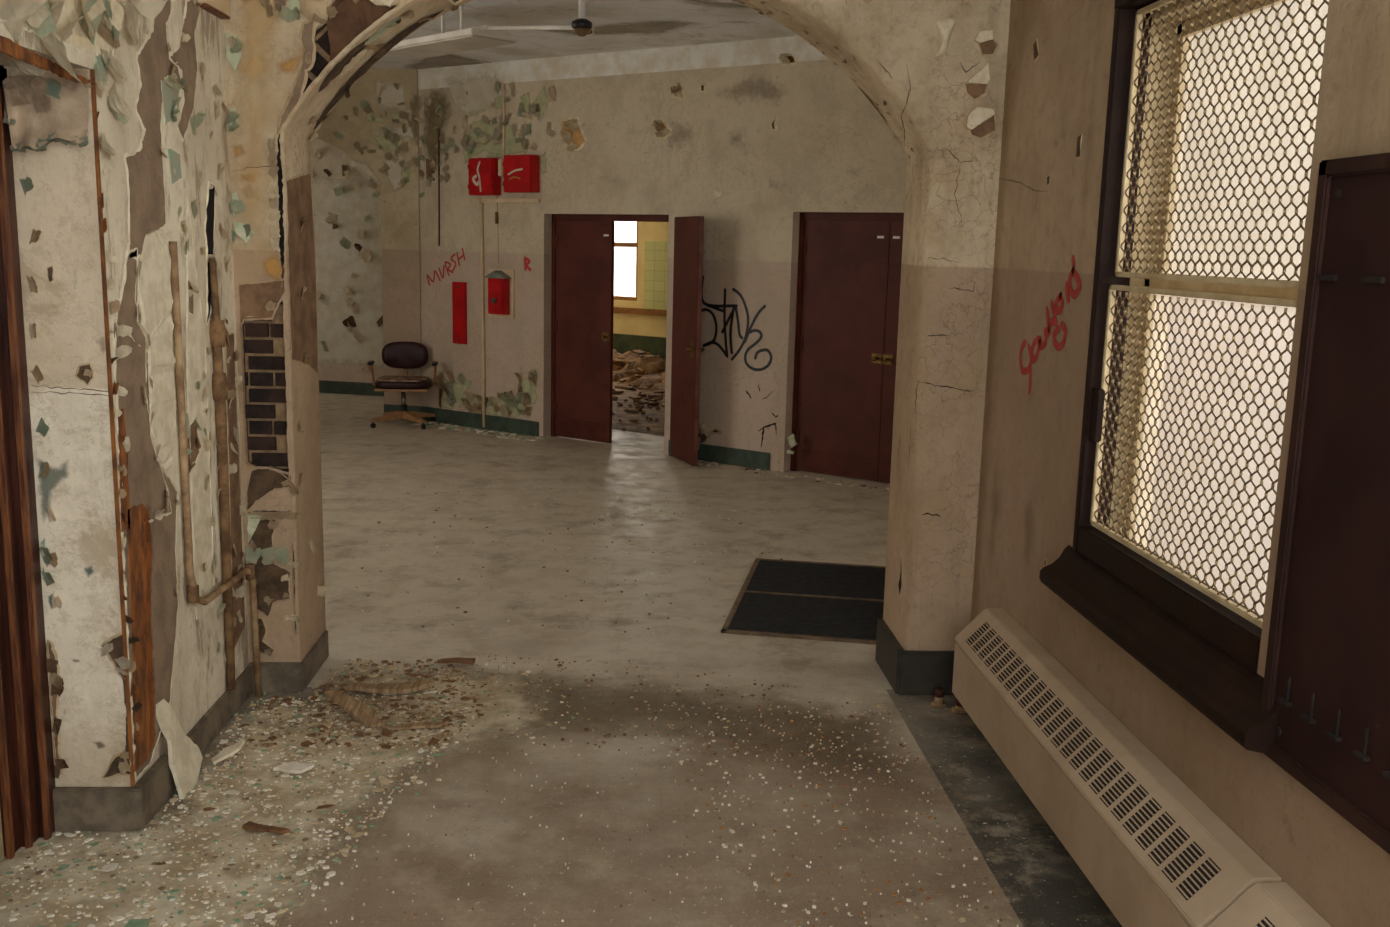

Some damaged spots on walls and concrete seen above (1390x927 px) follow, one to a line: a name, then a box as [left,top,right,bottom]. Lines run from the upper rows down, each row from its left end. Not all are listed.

peeling [732,0,913,161]
peeling [963,30,999,140]
peeling [0,0,587,782]